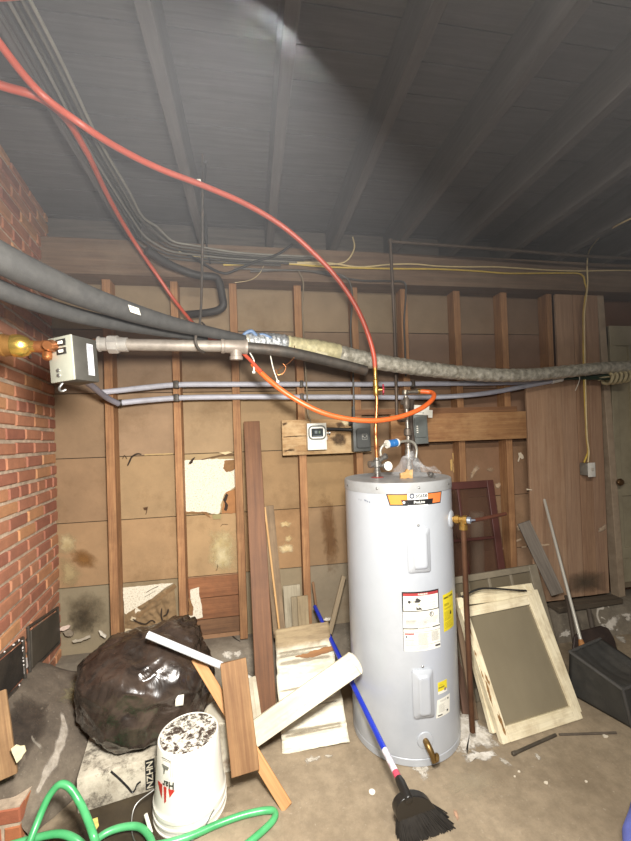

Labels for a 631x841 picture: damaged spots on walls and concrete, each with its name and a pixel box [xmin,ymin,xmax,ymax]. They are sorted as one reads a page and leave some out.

peeling [185,451,236,519]
peeling [123,583,173,614]
leakage [458,711,511,765]